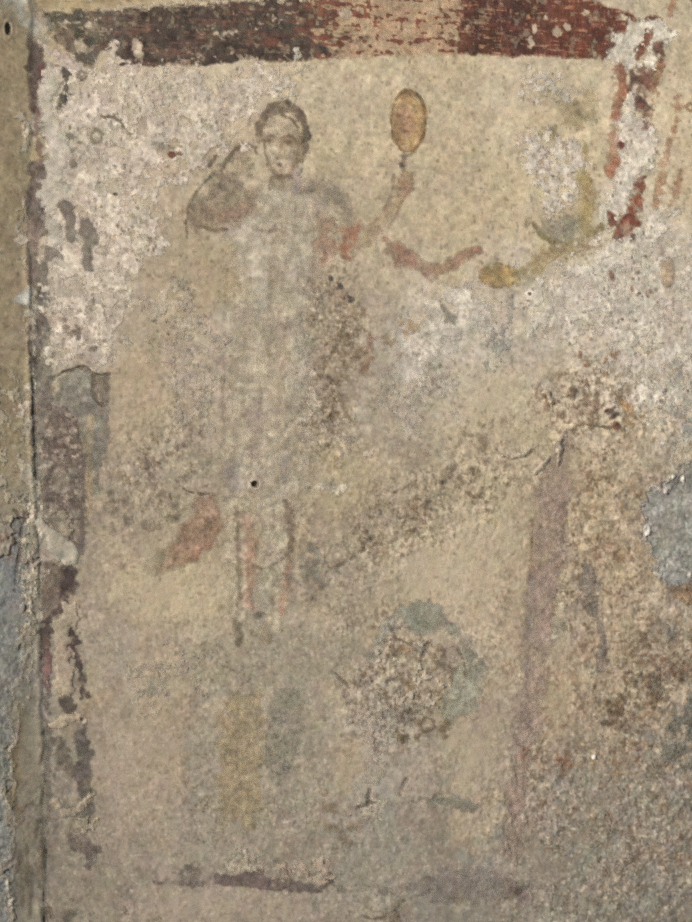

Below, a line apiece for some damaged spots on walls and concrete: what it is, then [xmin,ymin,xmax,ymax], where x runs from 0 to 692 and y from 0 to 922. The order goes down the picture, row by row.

leakage [44,247,63,261]
leakage [57,201,98,271]
peeling [12,36,312,373]
peeling [0,360,43,456]
leakage [375,282,529,444]
leakage [643,361,692,465]
peeling [0,513,40,922]